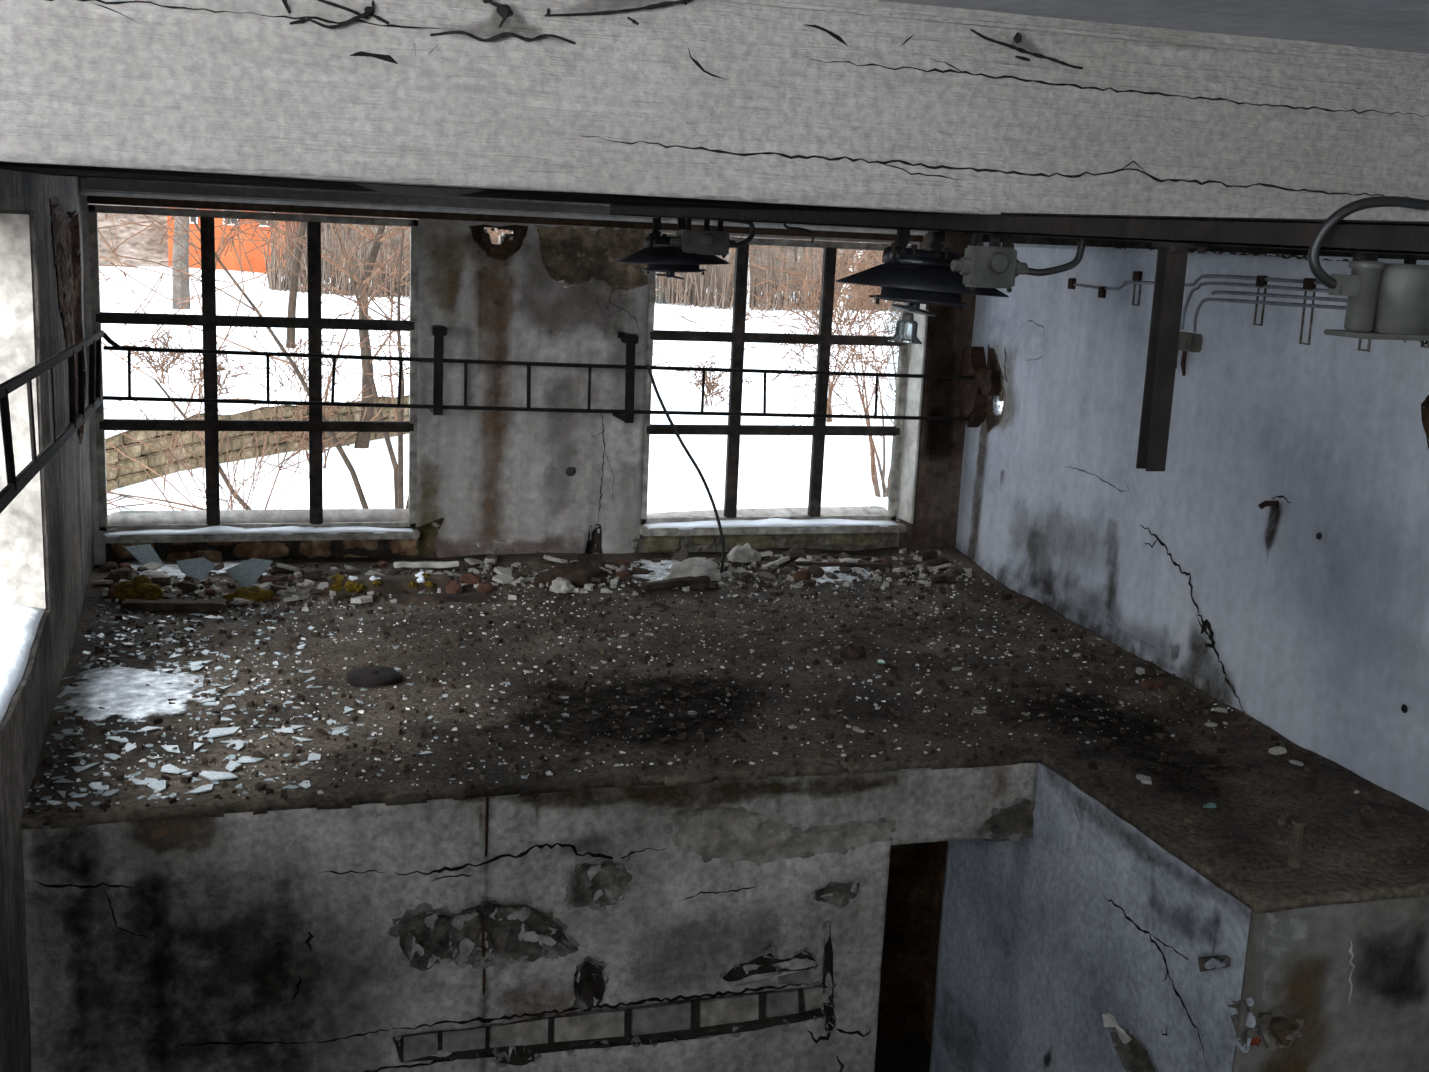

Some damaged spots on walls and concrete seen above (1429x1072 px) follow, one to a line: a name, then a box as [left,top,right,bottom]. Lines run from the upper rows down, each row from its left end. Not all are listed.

crack [47,0,441,29]
crack [811,58,1427,117]
crack [579,135,1411,198]
flaking render [468,224,651,294]
spalling [1420,395,1429,452]
crack [1141,525,1245,713]
water stain [1160,633,1231,705]
crack [324,843,666,882]
water stain [79,880,309,1072]
crack [179,920,871,1072]
flaking render [388,856,835,1067]
flaking render [1102,1013,1155,1072]